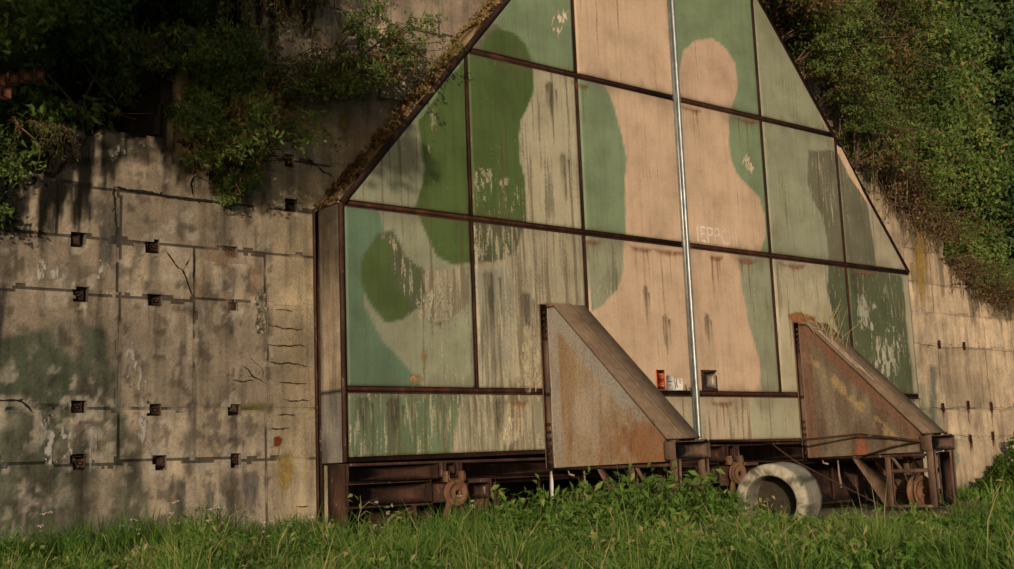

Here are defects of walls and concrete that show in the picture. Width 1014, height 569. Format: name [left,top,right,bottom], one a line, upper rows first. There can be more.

damp [0,139,87,233]
crack [166,250,195,297]
corrosion [788,313,815,323]
peeling [857,292,902,378]
peeling [39,414,73,465]